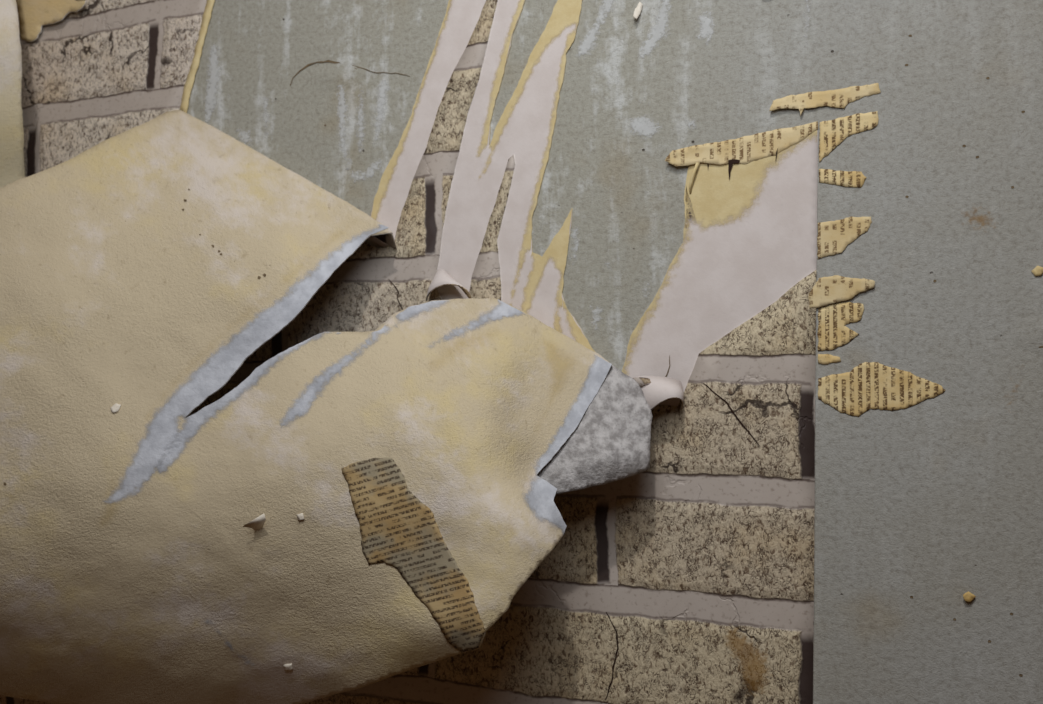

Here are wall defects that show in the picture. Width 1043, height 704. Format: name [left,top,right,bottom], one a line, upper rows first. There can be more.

damp [579,0,613,54]
damp [640,0,671,57]
damp [698,11,713,41]
damp [205,45,221,122]
crack [290,60,408,86]
damp [337,81,389,156]
damp [630,117,660,137]
crack [703,383,760,447]